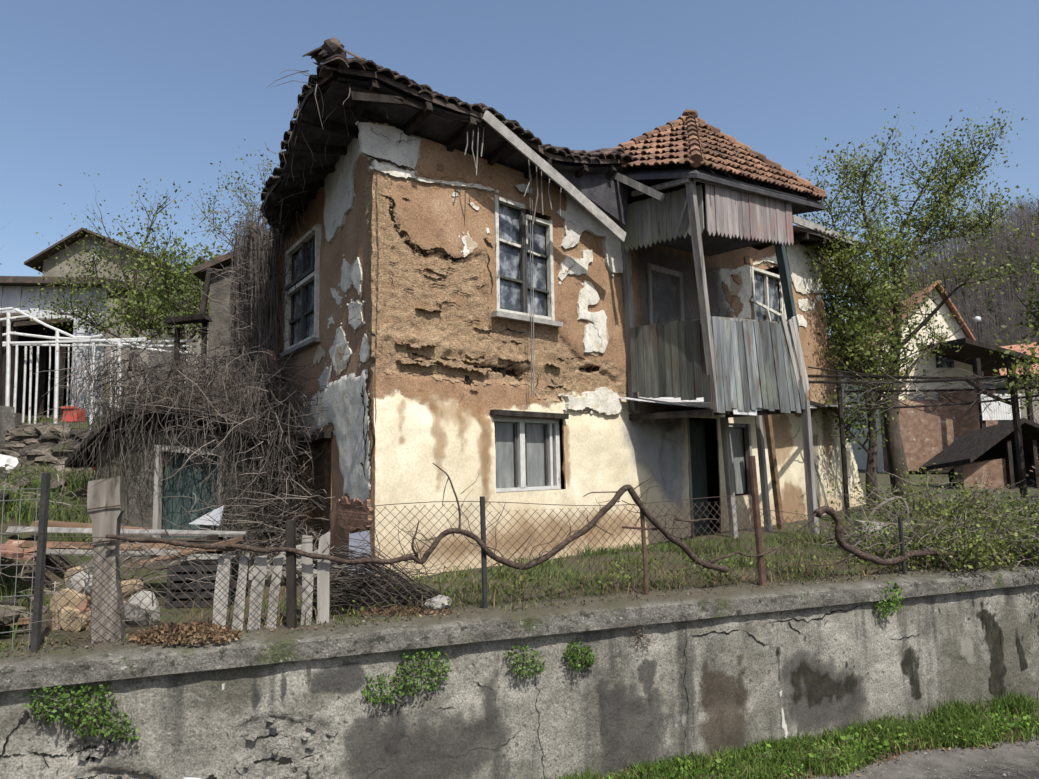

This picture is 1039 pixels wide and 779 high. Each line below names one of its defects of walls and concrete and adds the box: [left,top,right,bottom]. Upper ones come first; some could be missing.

crack [364,153,414,170]
peeling [324,121,499,244]
peeling [313,255,370,391]
crack [378,193,600,400]
peeling [556,191,623,356]
peeling [713,243,823,328]
crack [0,711,123,779]
spalling [232,714,338,779]
water stain [348,673,505,779]
crack [683,605,862,754]
water stain [777,647,863,739]
water stain [981,601,1004,654]